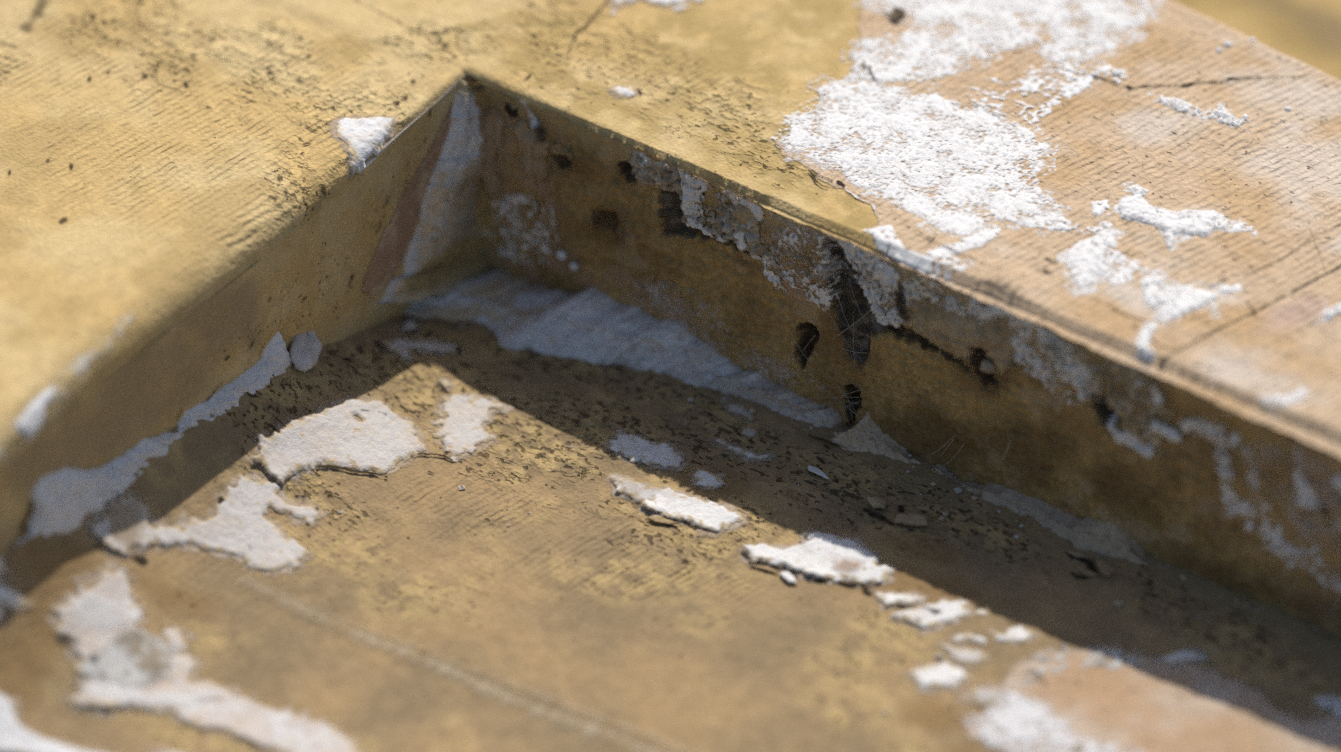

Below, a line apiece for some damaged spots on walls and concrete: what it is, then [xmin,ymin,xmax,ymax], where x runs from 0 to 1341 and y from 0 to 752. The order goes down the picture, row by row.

peeling [609,0,706,15]
peeling [0,308,134,456]
spalling [303,74,1150,579]
peeling [778,0,1341,458]
crack [1108,224,1341,369]
peeling [0,331,514,752]
peeling [739,529,1341,752]